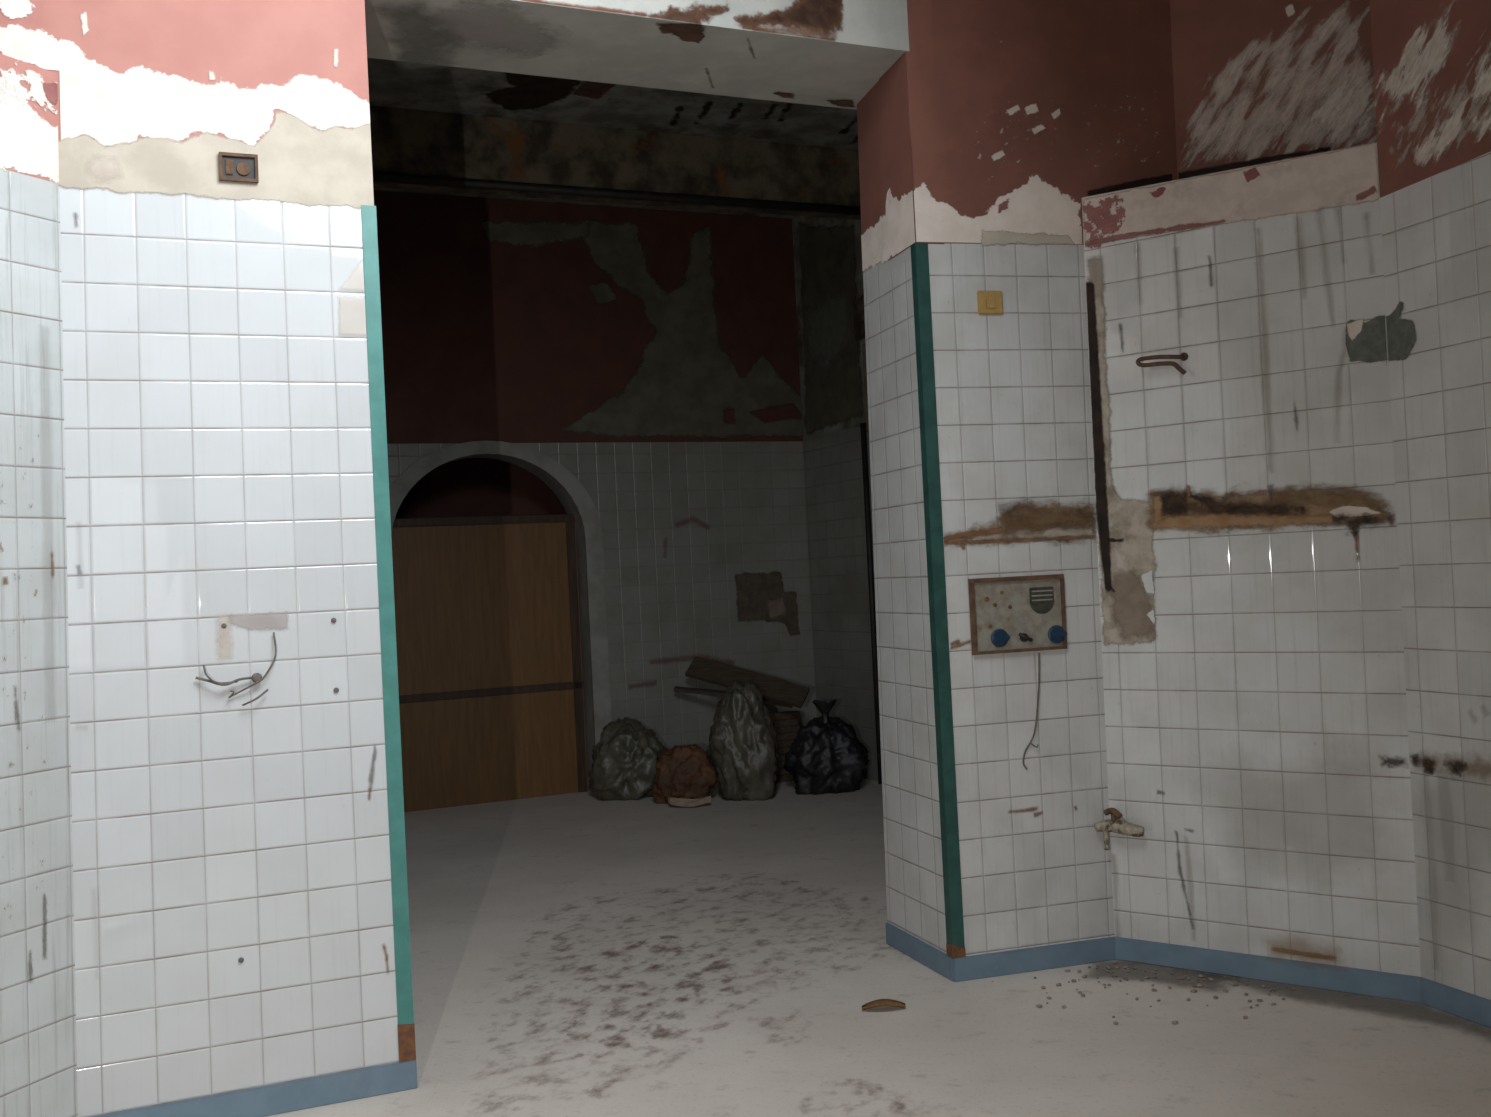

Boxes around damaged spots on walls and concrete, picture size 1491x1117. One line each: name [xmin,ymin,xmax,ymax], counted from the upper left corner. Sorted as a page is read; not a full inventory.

peeling [0,0,374,209]
spalling [648,0,843,43]
peeling [481,219,803,439]
peeling [861,1,1491,645]
rust [1382,755,1491,776]